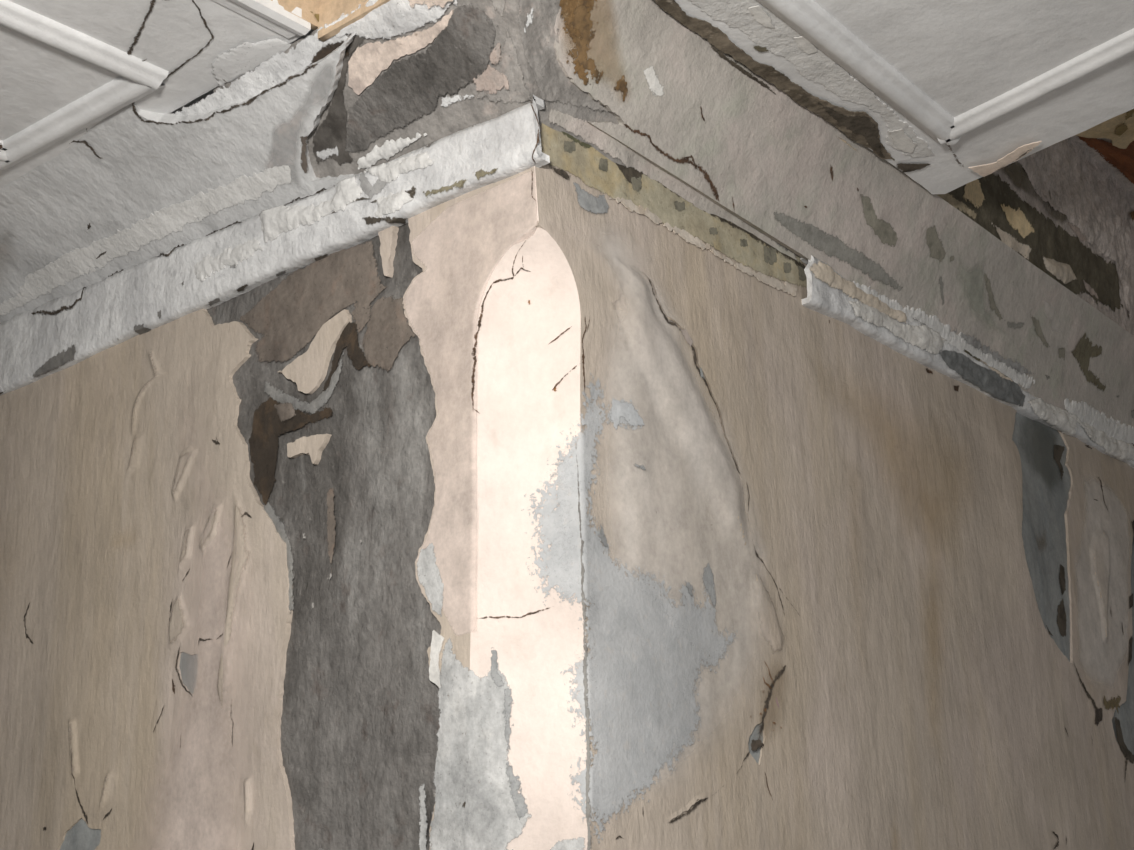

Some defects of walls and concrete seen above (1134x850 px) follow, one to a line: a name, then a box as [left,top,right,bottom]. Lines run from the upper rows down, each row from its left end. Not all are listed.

crack [127,0,214,79]
rust [559,0,604,85]
peeling [441,0,798,261]
rust [614,75,628,101]
peeling [1076,109,1134,149]
spalling [207,173,532,850]
crack [471,242,531,413]
crack [576,447,624,850]
peeling [521,372,741,850]
crack [644,274,799,616]
crack [737,661,786,797]
flaking render [773,212,1134,778]